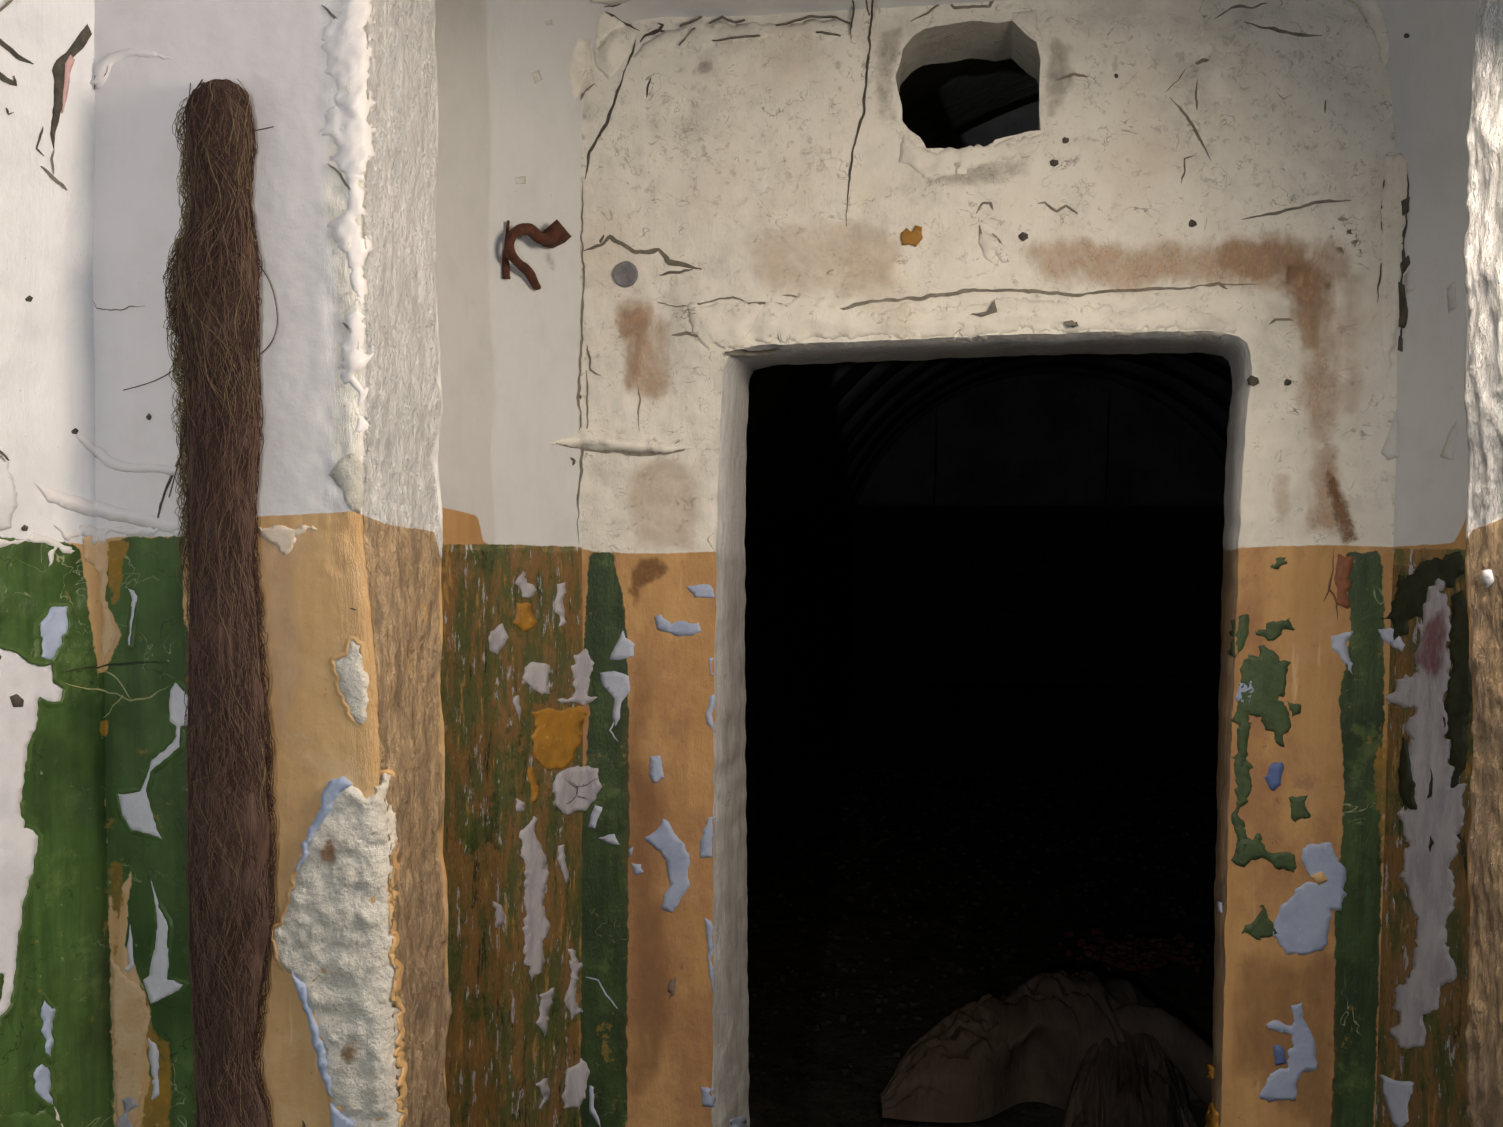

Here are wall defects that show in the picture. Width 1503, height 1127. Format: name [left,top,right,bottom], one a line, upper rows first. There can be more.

crack [910,0,994,22]
crack [570,0,874,538]
crack [840,282,1256,310]
rust [1317,462,1355,542]
peeling [0,602,74,1033]
peeling [114,680,188,842]
peeling [513,631,716,1037]
peeling [1227,614,1347,955]
peeling [1378,551,1494,1049]
peeling [110,870,190,1127]
peeling [536,1058,601,1127]
peeling [1258,1003,1318,1102]